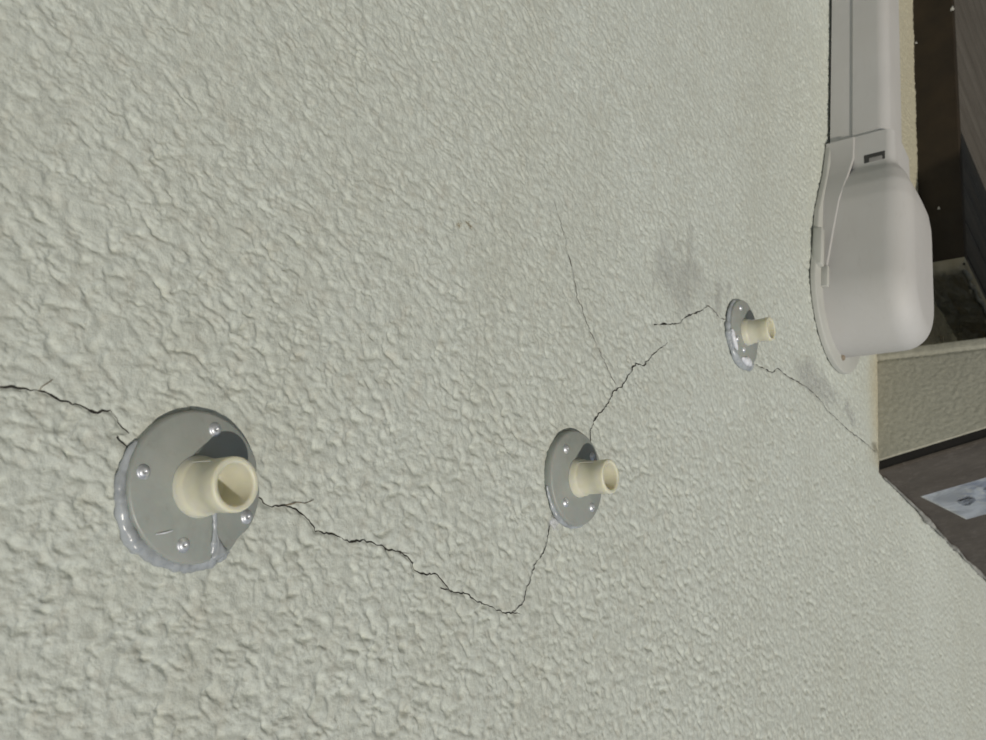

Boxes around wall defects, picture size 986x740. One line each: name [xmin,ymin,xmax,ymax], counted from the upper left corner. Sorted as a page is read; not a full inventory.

crack [555,205,726,441]
crack [0,379,129,447]
crack [756,364,874,451]
crack [259,497,550,615]